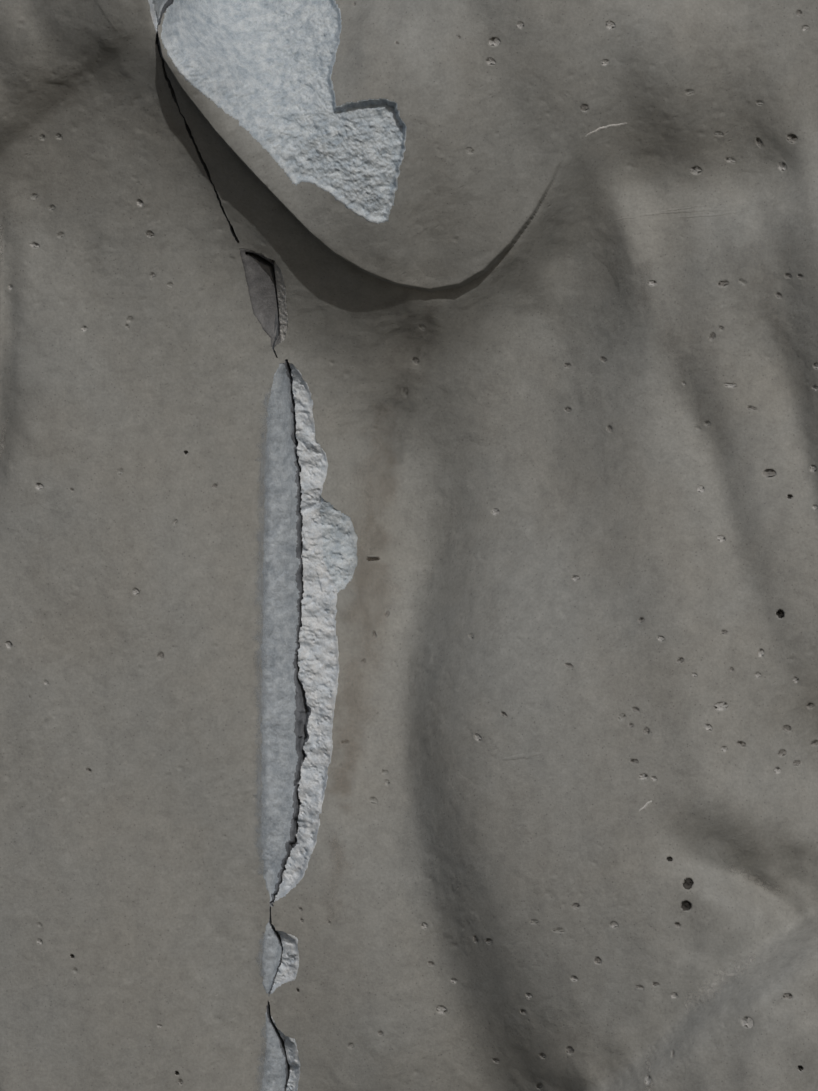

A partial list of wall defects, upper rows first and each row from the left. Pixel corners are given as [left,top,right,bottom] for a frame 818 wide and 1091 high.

spalling [148,0,407,224]
spalling [239,248,288,350]
crack [155,0,311,1091]
spalling [257,359,379,907]
spalling [259,922,299,996]
spalling [260,1009,300,1091]